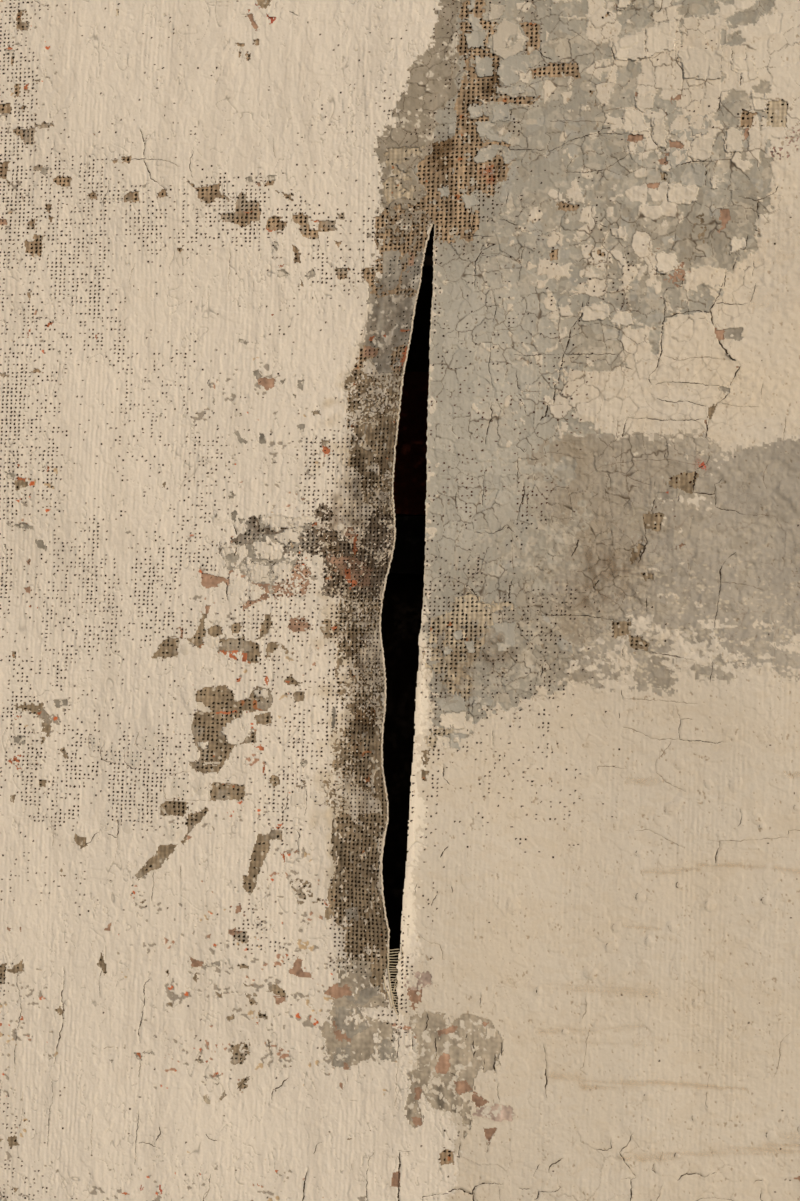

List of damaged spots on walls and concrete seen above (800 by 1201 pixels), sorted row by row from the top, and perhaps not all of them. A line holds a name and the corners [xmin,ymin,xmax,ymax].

peeling [0,79,54,145]
peeling [614,16,788,205]
crack [509,107,714,227]
peeling [25,203,55,257]
crack [455,187,778,604]
peeling [135,0,581,1089]
crack [714,552,761,628]
peeling [203,1039,250,1104]
crack [395,1014,502,1098]
peeling [404,971,515,1145]
crack [366,1150,563,1201]
crack [598,1136,762,1201]